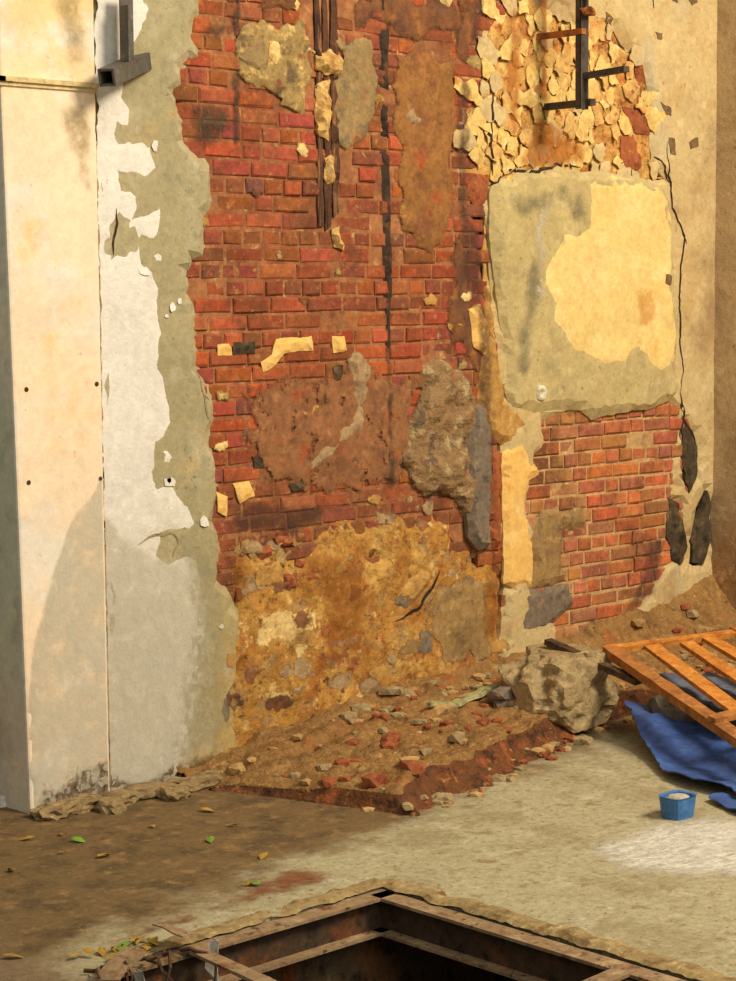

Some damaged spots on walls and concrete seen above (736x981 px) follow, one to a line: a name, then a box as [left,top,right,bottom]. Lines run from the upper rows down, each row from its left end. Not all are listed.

spalling [94,0,712,791]
corrosion [283,963,295,981]